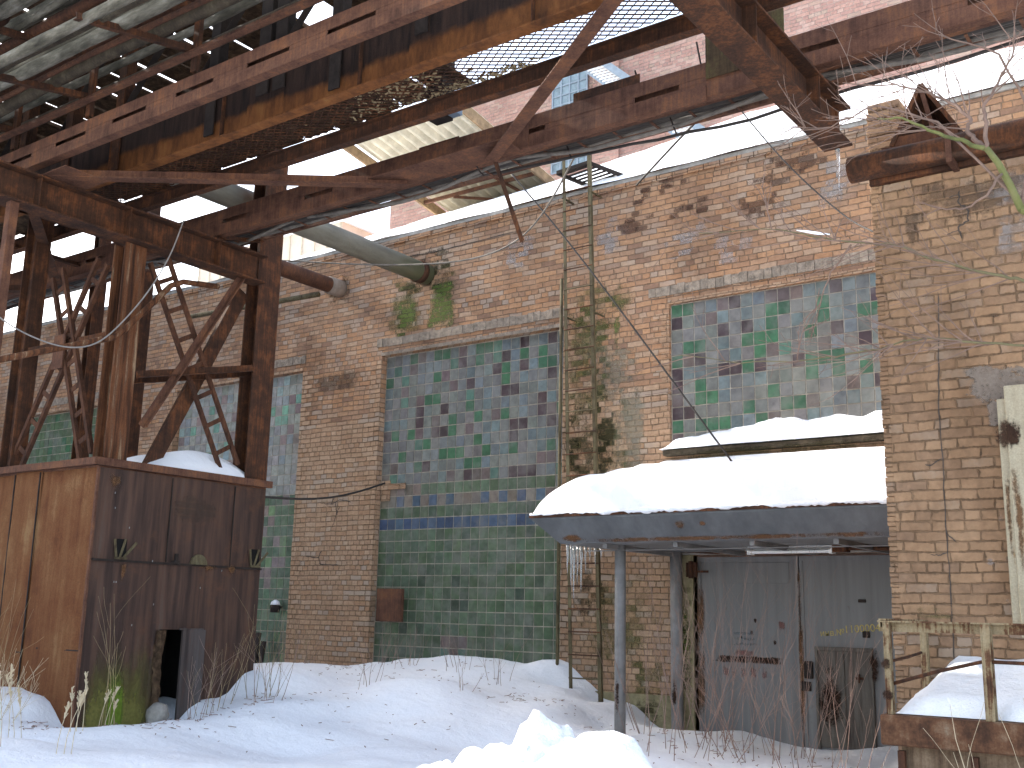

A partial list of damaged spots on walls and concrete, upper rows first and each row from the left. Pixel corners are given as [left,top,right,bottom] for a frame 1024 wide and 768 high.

spalling [618,176,686,234]
spalling [670,196,708,218]
damp [390,281,453,337]
damp [570,295,628,412]
peeling [987,401,998,426]
rust [869,653,890,681]